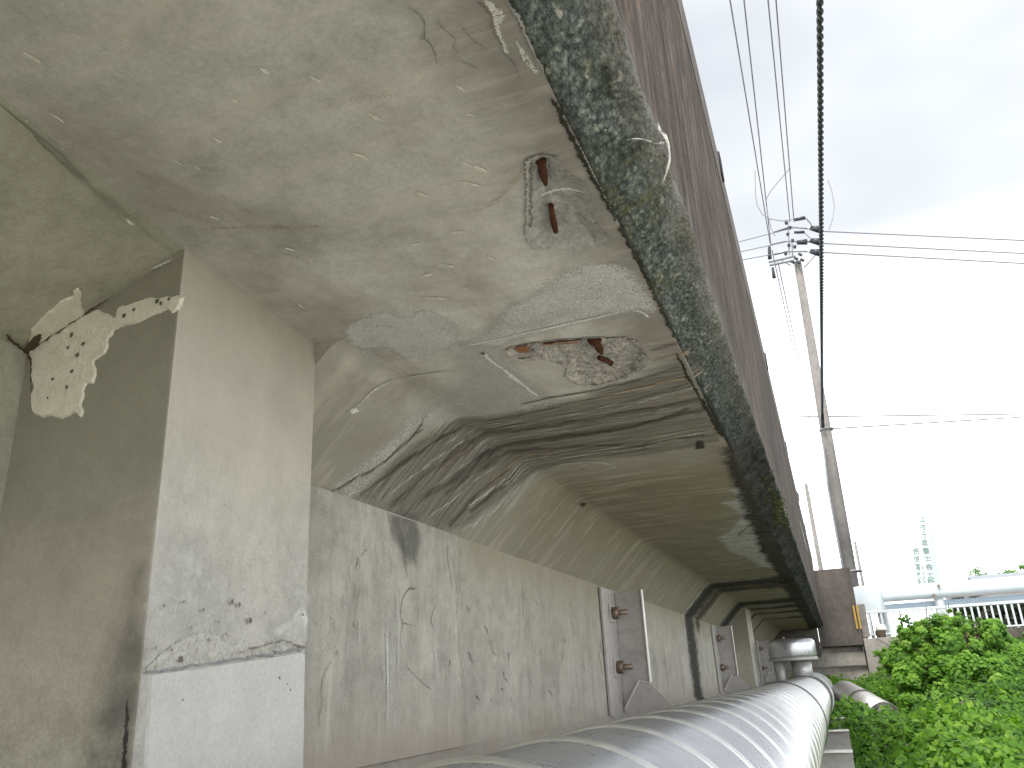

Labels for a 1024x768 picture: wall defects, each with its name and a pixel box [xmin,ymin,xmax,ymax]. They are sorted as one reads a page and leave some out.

crack [408,8,483,68]
crack [506,1,544,74]
leakage [627,123,671,181]
spalling [524,154,609,252]
crack [551,98,724,437]
crack [6,334,24,351]
peeling [23,288,185,419]
spalling [505,337,650,387]
leakage [328,257,822,730]
crack [400,563,463,689]